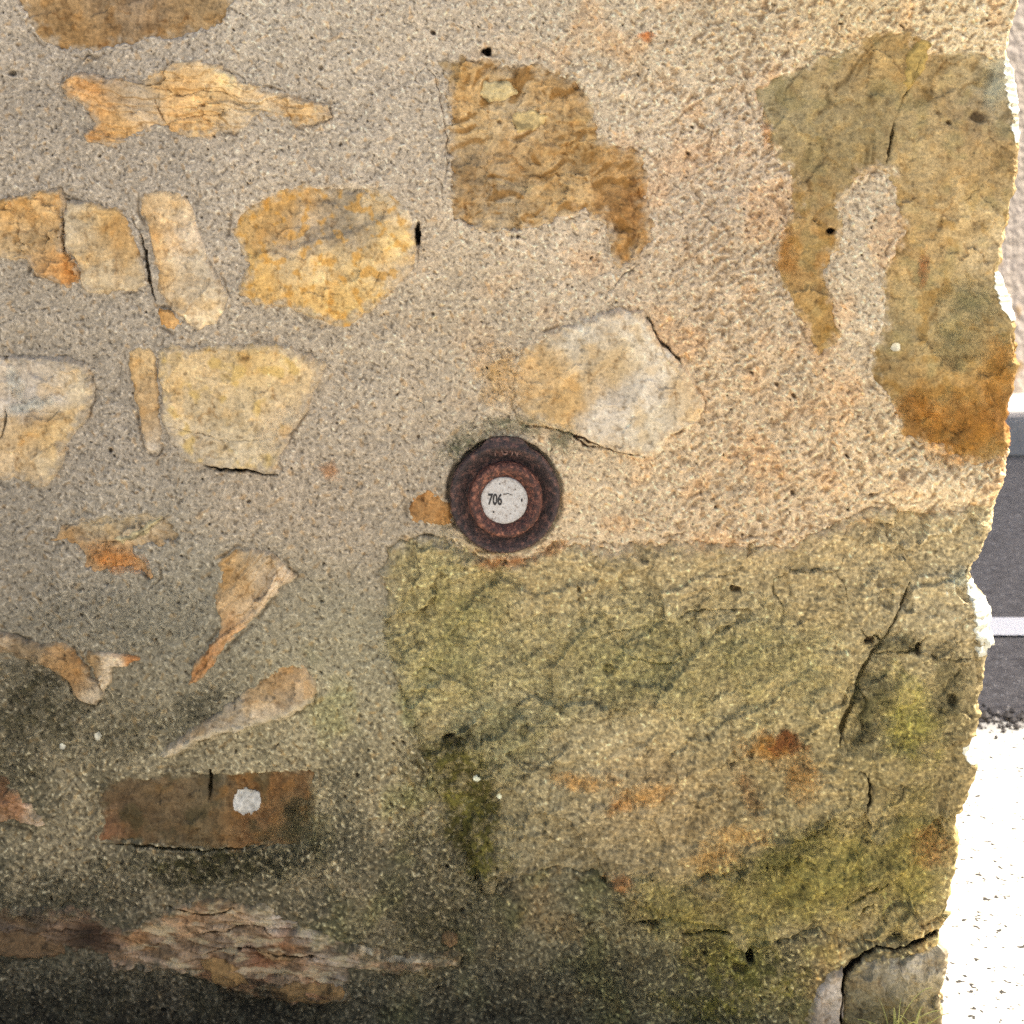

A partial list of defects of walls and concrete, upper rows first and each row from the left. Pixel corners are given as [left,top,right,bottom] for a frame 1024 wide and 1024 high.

crack [133,221,156,299]
crack [649,318,680,361]
crack [839,582,925,744]
leakage [0,666,79,769]
leakage [0,977,335,1024]